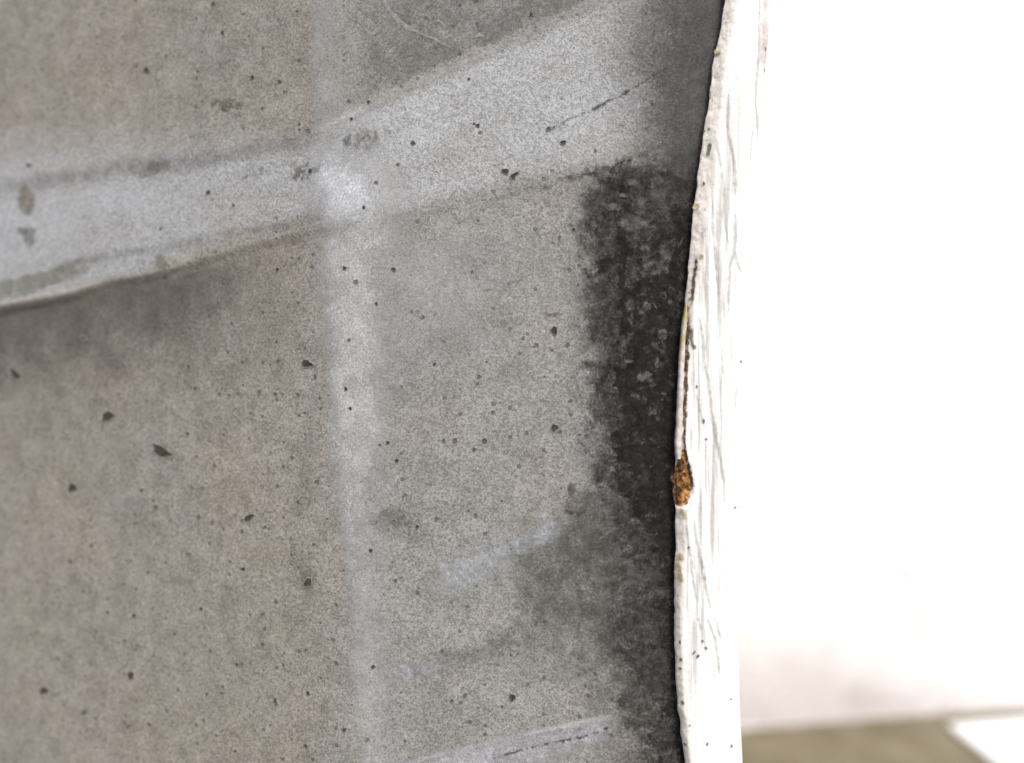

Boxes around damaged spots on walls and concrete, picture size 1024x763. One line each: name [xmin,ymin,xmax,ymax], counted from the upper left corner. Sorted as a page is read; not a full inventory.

leakage [548,0,725,763]
rust [671,259,698,506]